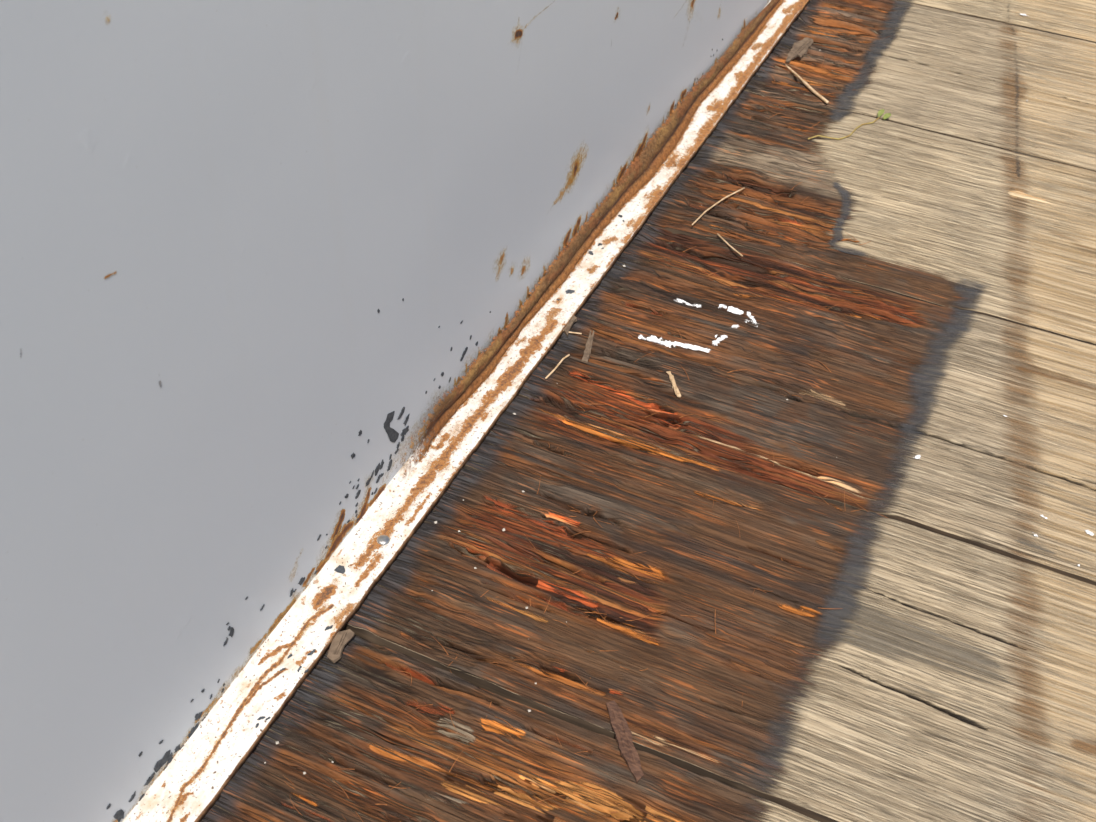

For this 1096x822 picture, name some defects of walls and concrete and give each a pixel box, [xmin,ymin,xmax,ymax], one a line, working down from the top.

leakage [831,0,910,120]
rust [354,0,808,587]
leakage [830,182,865,255]
leakage [902,283,983,449]
leakage [1002,0,1096,554]
peeling [339,407,410,523]
rust [183,479,386,742]
leakage [819,516,1010,683]
leakage [1014,571,1096,760]
peeling [107,679,225,822]